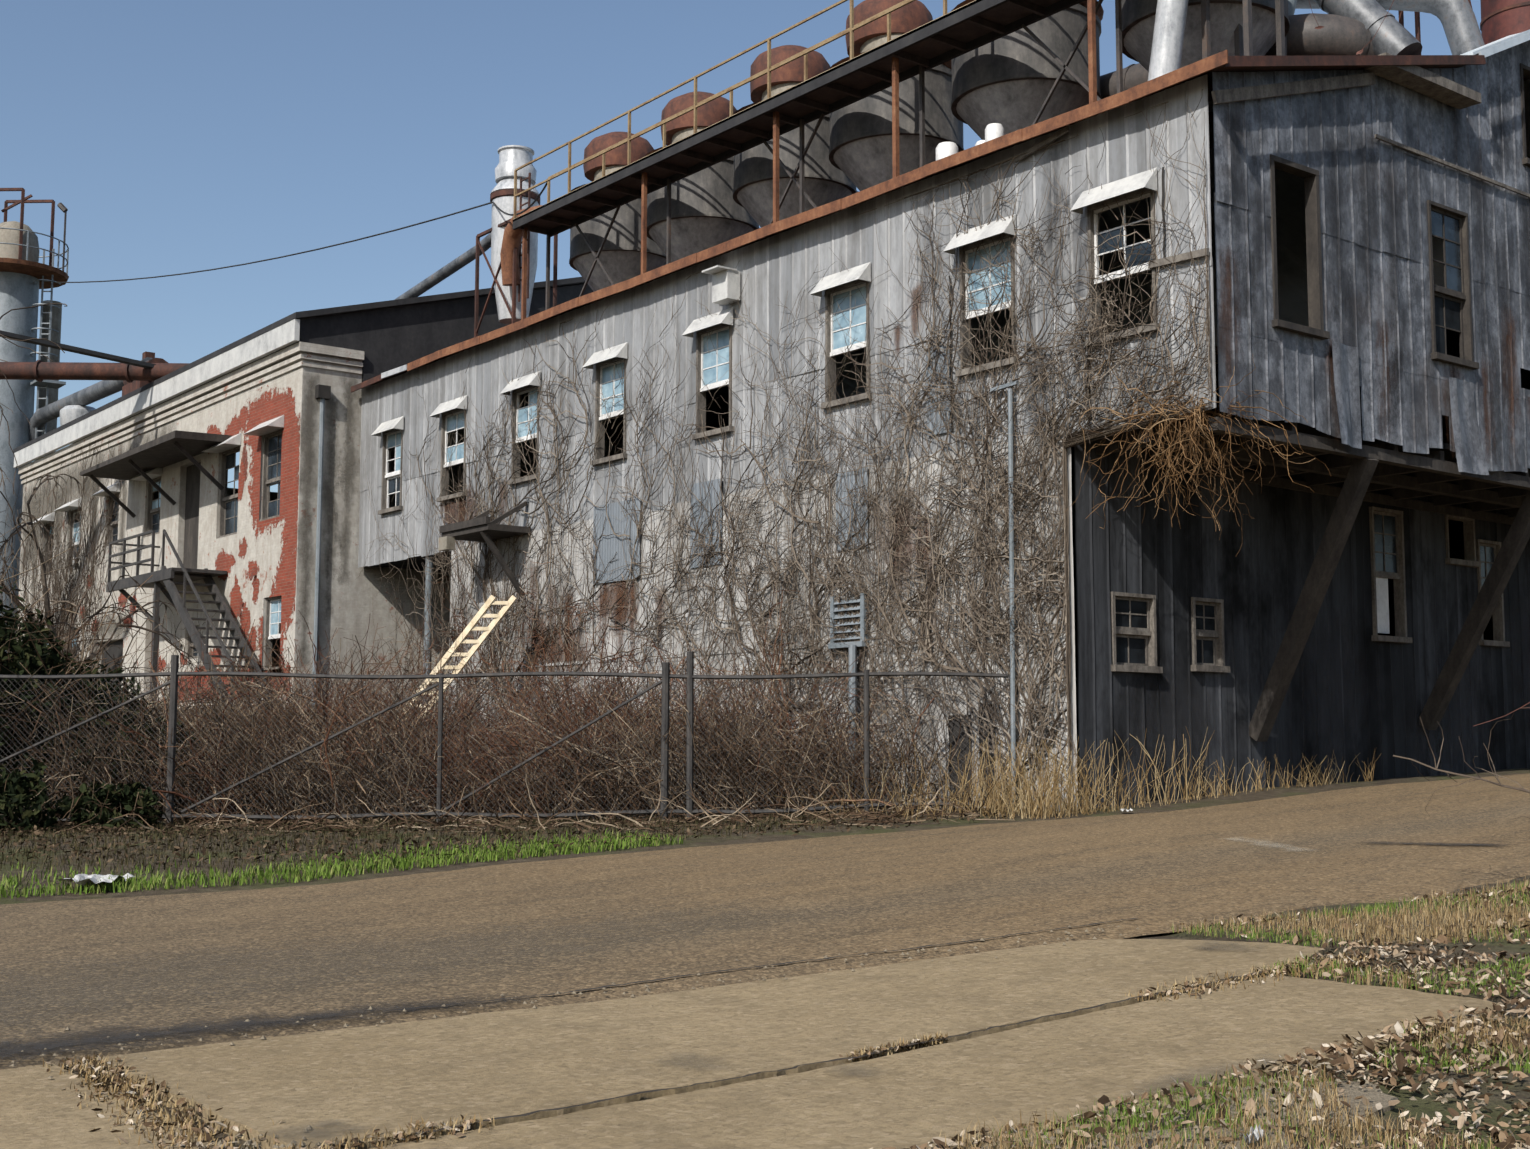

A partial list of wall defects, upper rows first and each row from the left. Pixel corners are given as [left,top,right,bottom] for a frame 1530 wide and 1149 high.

peeling [158,385,301,705]